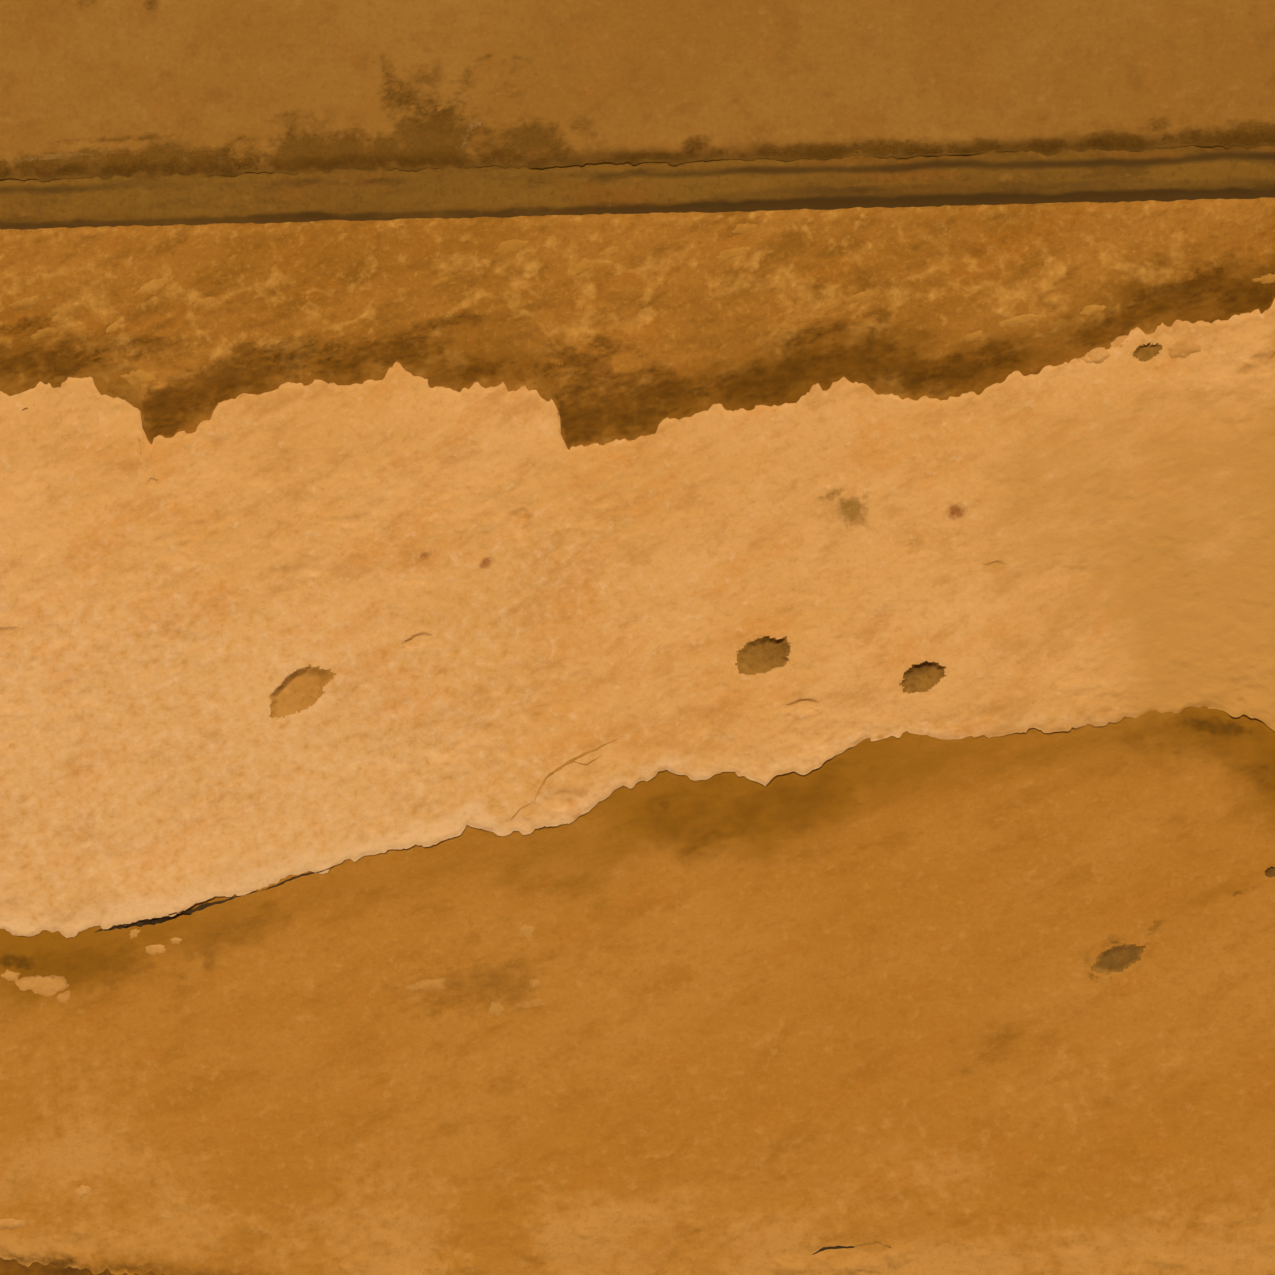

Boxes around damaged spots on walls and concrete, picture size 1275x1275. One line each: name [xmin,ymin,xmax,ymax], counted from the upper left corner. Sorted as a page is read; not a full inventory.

damp [0,108,568,176]
peeling [1252,273,1275,284]
peeling [0,299,1275,956]
spalling [1082,938,1155,979]
peeling [1,970,70,1003]